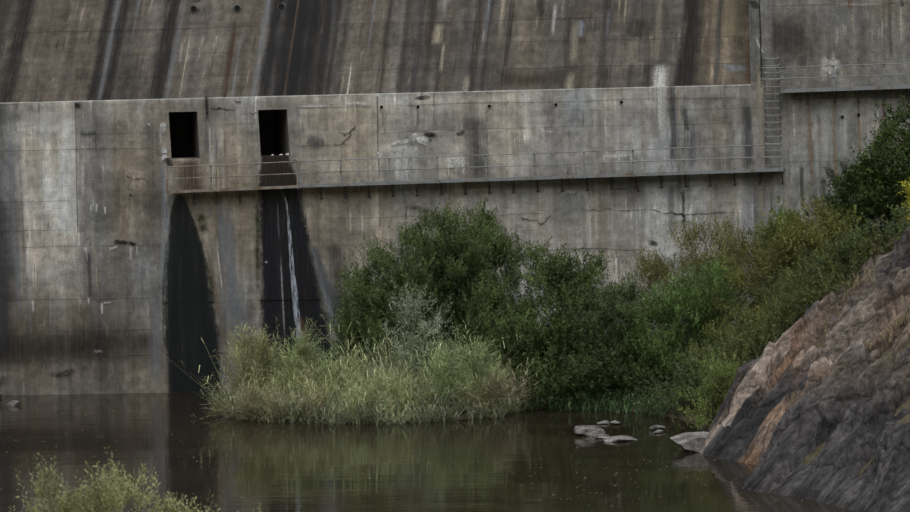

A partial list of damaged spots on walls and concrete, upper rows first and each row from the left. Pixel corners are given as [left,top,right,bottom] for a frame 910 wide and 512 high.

water stain [75,0,128,108]
water stain [149,0,180,99]
crack [580,184,737,224]
water stain [154,158,236,393]
water stain [255,155,344,389]